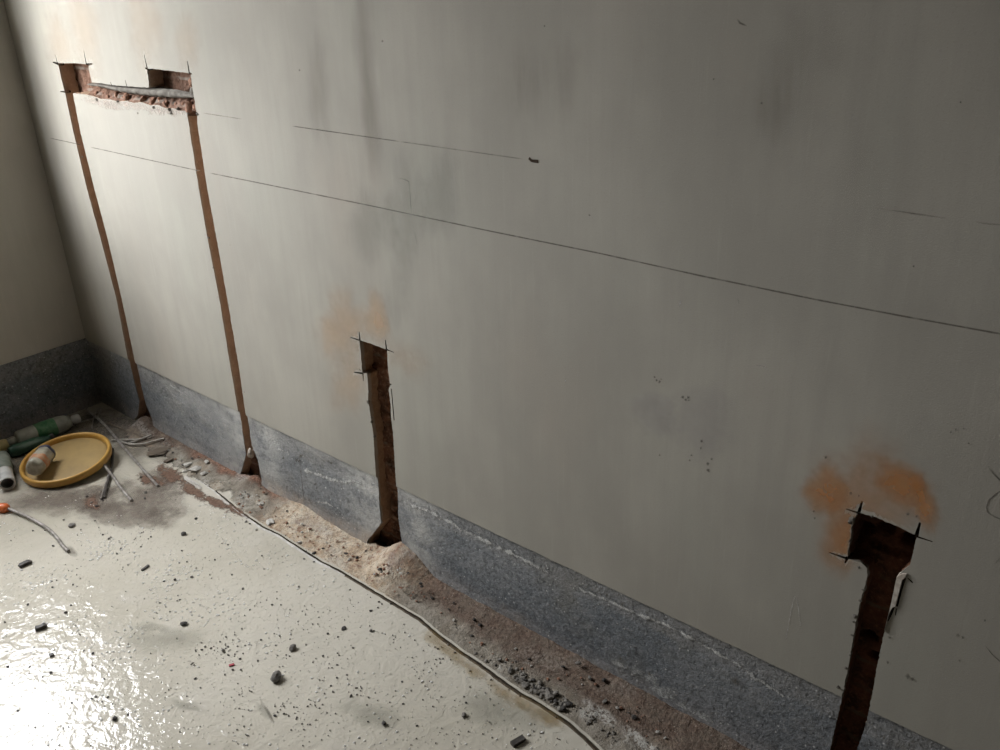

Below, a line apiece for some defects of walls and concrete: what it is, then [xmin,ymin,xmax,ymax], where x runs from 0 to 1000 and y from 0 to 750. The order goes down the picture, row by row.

flaking render [73,63,197,116]
flaking render [247,448,261,478]
flaking render [372,344,402,545]
flaking render [833,514,917,750]